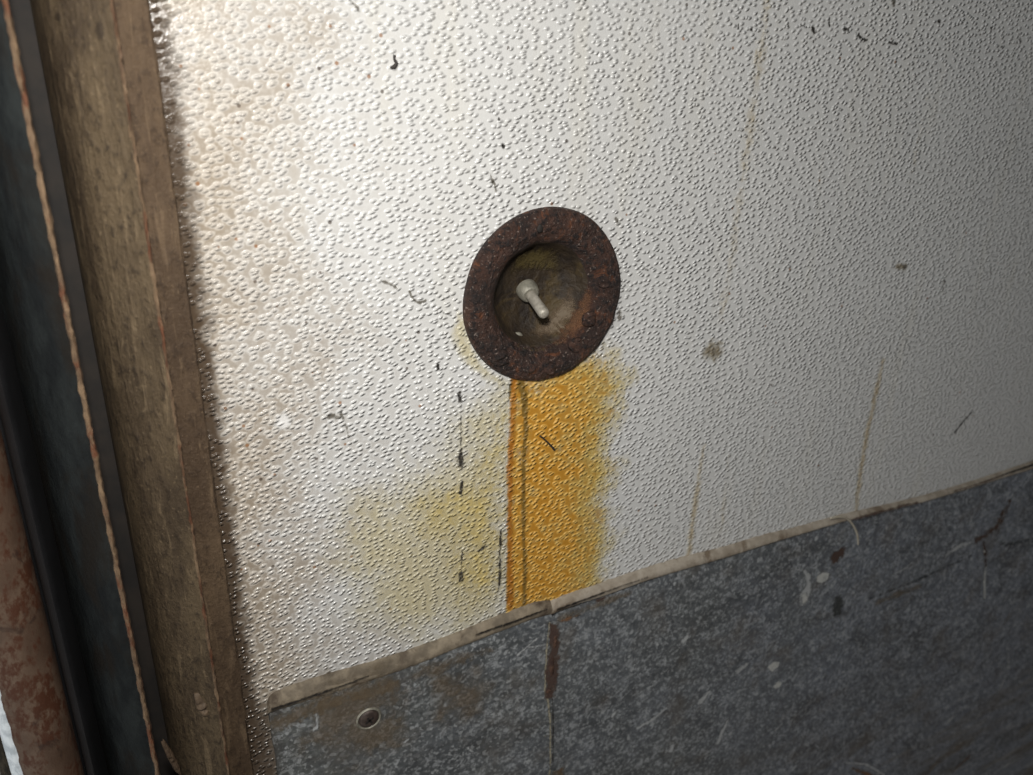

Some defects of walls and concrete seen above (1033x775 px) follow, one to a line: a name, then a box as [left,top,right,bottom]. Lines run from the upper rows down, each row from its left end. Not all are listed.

corrosion [2,0,160,775]
corrosion [506,360,624,613]